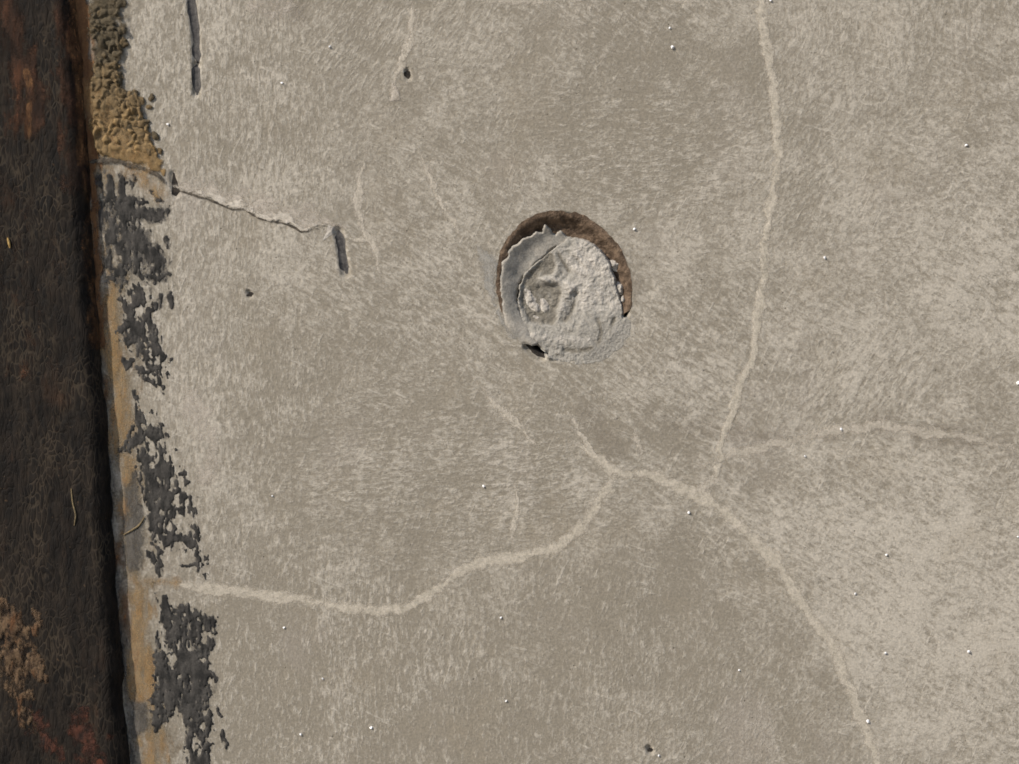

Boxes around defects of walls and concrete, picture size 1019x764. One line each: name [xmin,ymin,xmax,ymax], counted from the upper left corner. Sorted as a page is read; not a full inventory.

corrosion [0,0,51,137]
crack [390,8,416,101]
corrosion [76,0,158,483]
peeling [95,170,229,764]
crack [88,149,381,273]
crack [421,155,459,233]
crack [477,383,536,444]
peeling [524,288,550,319]
spalling [526,344,558,360]
crack [572,0,999,764]
crack [172,478,616,617]
corrosion [30,705,106,764]